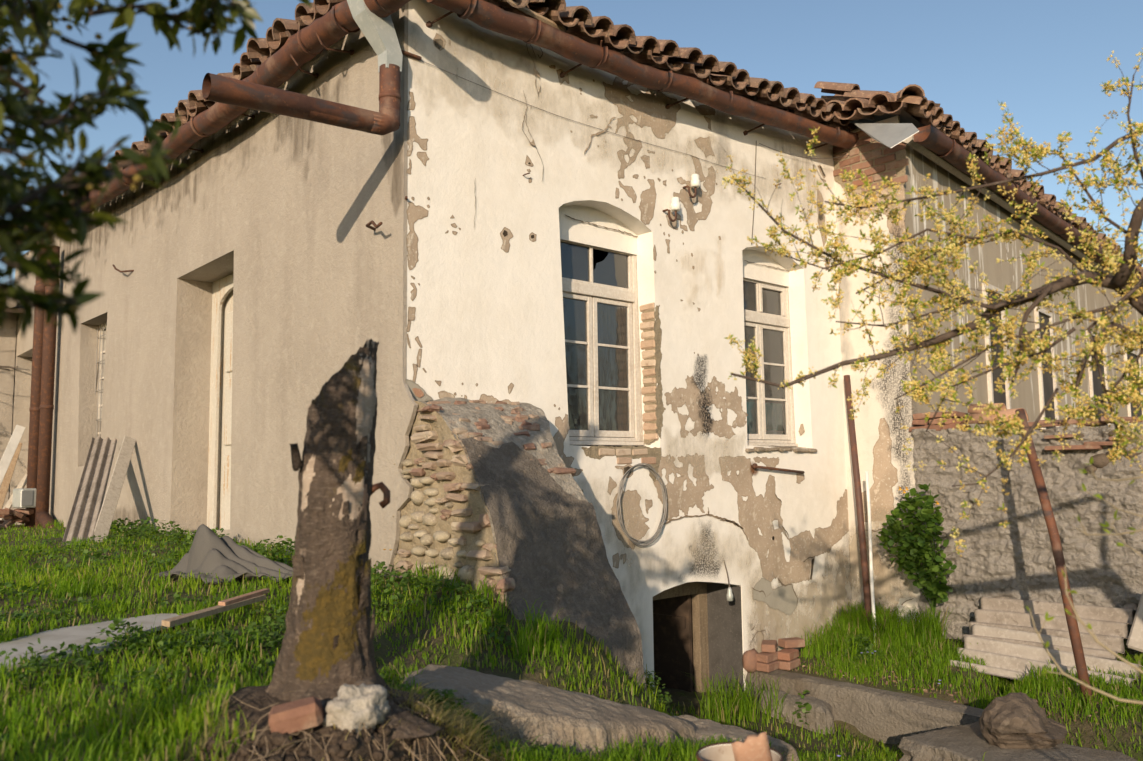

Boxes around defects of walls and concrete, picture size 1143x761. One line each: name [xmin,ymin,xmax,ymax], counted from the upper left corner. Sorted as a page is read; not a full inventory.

peeling [406,91,429,174]
peeling [549,65,717,274]
peeling [406,197,514,404]
peeling [553,302,849,586]
leakage [699,394,712,435]
peeling [862,418,898,522]